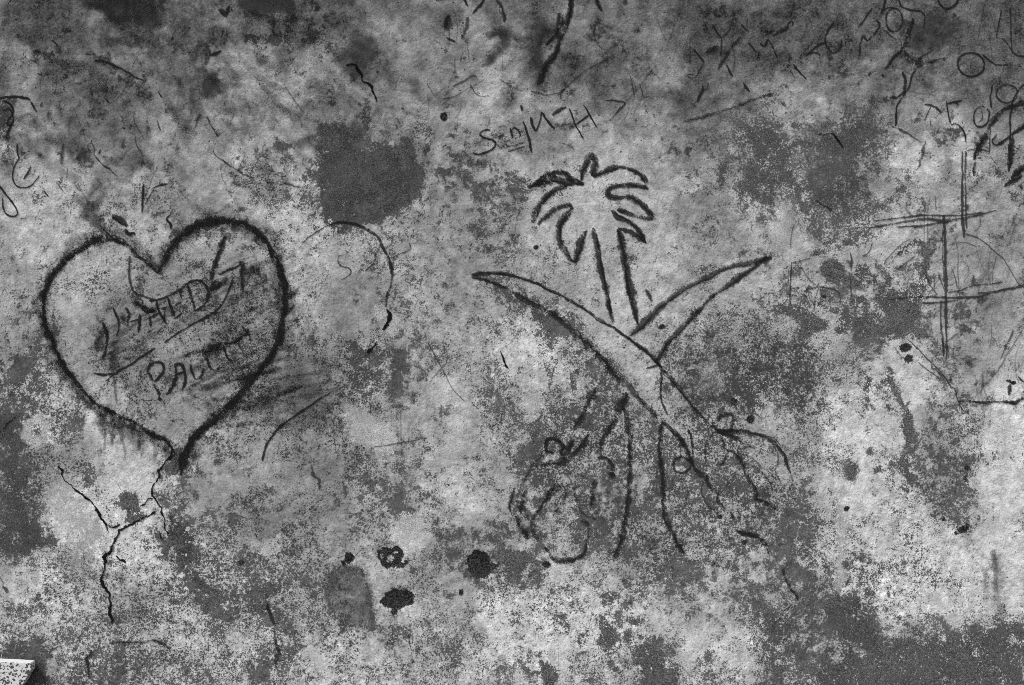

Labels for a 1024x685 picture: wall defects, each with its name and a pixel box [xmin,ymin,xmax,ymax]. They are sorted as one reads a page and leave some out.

crack [57,446,173,677]